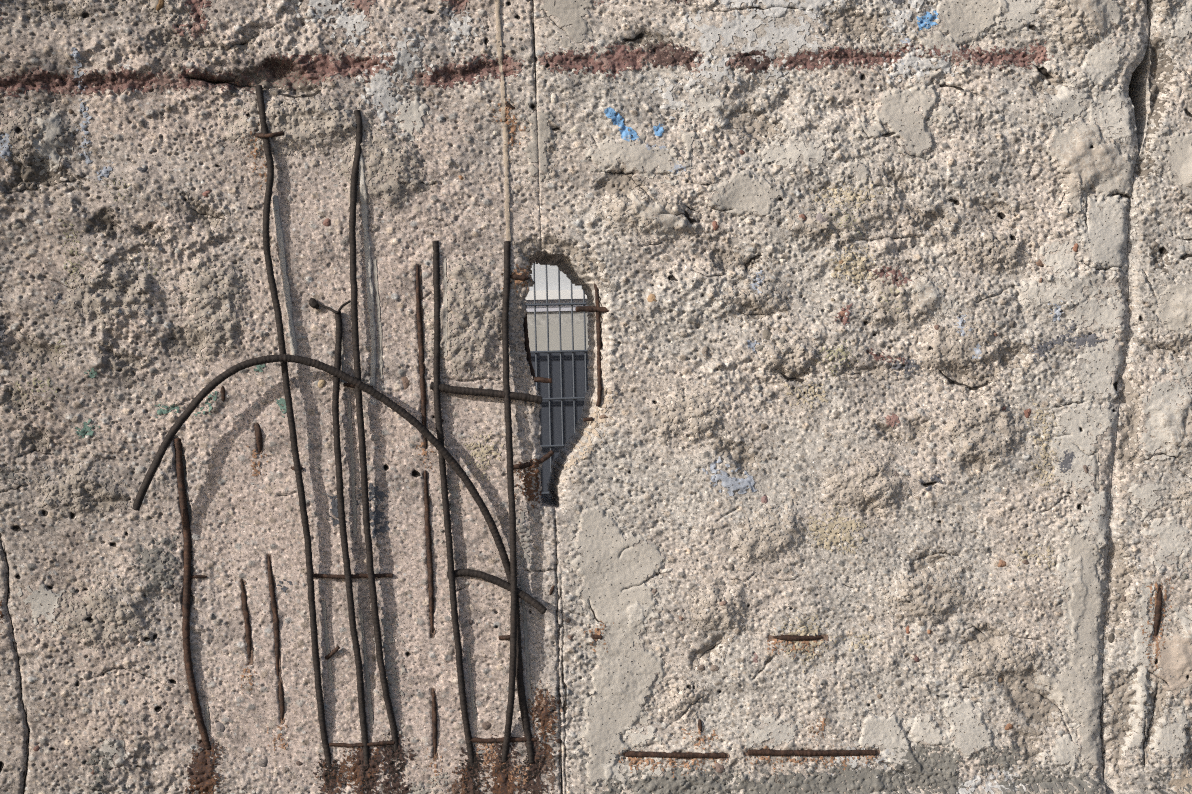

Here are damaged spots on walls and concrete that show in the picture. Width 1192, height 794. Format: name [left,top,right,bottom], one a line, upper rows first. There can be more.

corrosion [491,98,529,152]
crack [1060,193,1134,228]
corrosion [501,264,532,293]
spalling [0,0,618,771]
corrosion [514,458,542,513]
corrosion [767,628,827,660]
corrosion [1141,577,1174,672]
corrosion [176,732,227,794]
corrosion [313,680,565,794]
corrosion [619,726,728,779]
corrosion [746,715,884,773]
crack [1143,672,1168,766]